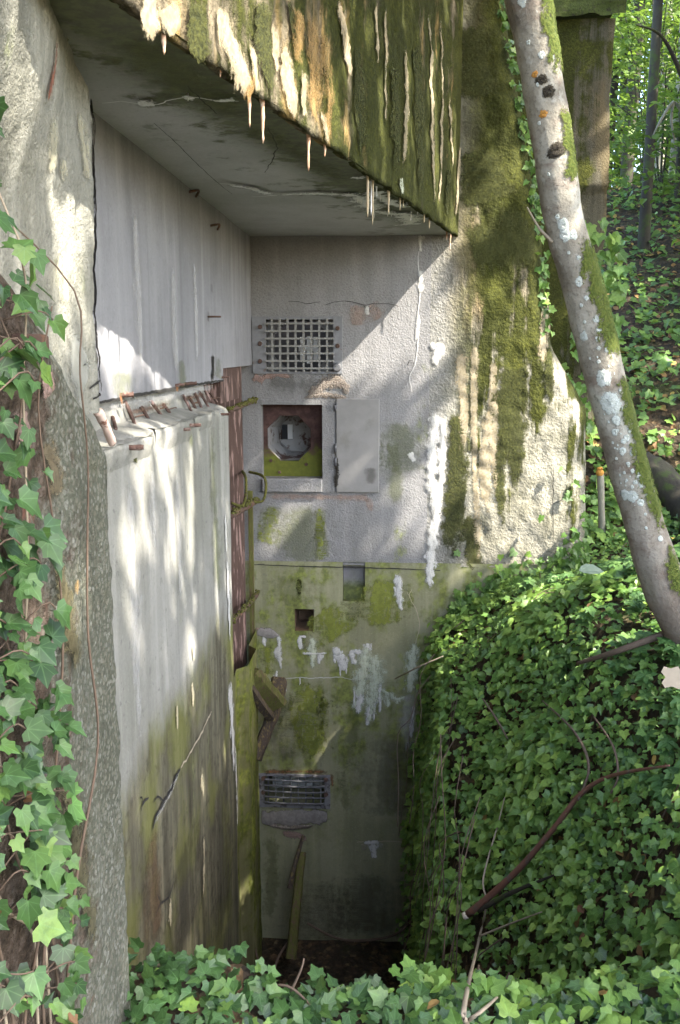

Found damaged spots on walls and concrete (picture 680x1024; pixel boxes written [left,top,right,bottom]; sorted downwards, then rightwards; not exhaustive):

crack [108,86,362,197]
damp [347,5,461,226]
spalling [305,374,350,399]
crack [290,235,425,391]
damp [538,297,555,402]
damp [407,347,531,588]
damp [314,509,329,559]
damp [262,637,283,681]
damp [297,635,420,738]
crack [140,712,212,828]
damp [228,683,238,825]